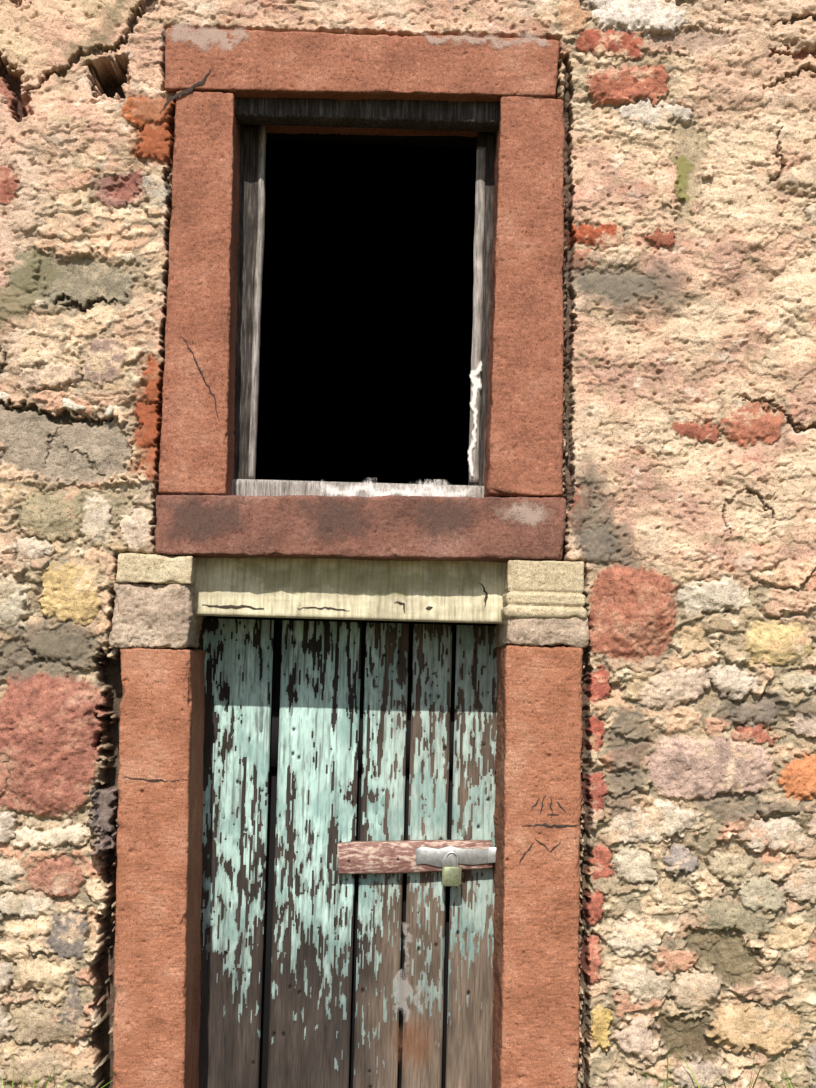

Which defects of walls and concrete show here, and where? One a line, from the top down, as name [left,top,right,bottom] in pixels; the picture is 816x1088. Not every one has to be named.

crack [26,0,159,92]
crack [763,12,816,89]
crack [0,345,8,373]
crack [739,392,816,433]